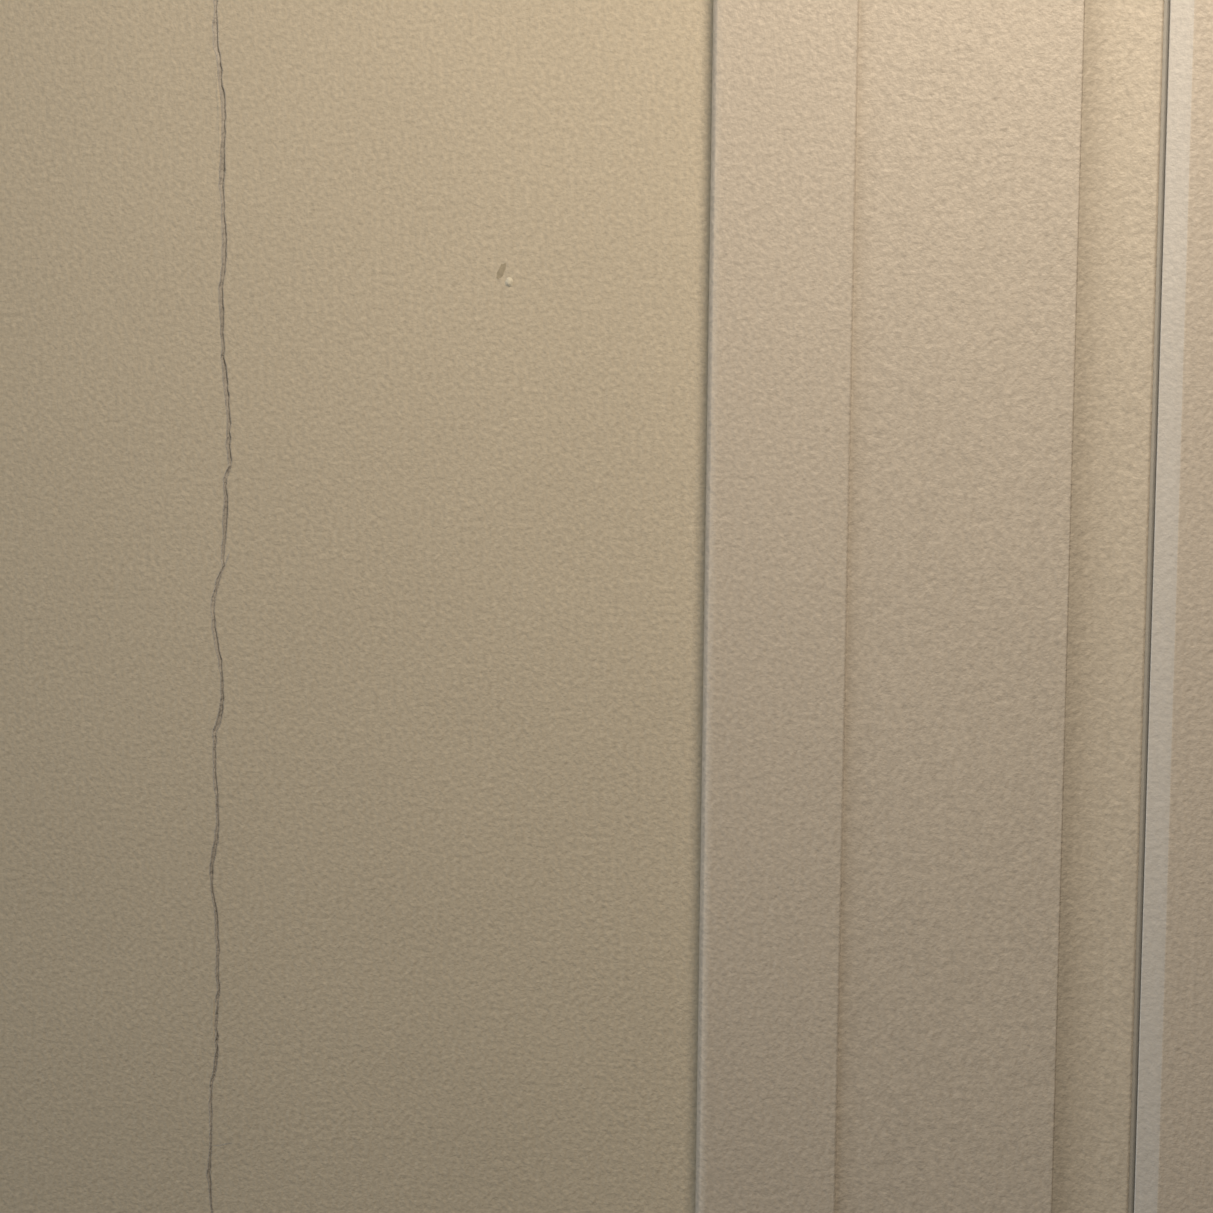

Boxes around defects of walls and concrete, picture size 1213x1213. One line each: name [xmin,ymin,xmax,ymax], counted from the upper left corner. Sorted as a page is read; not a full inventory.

crack [206,0,233,1213]